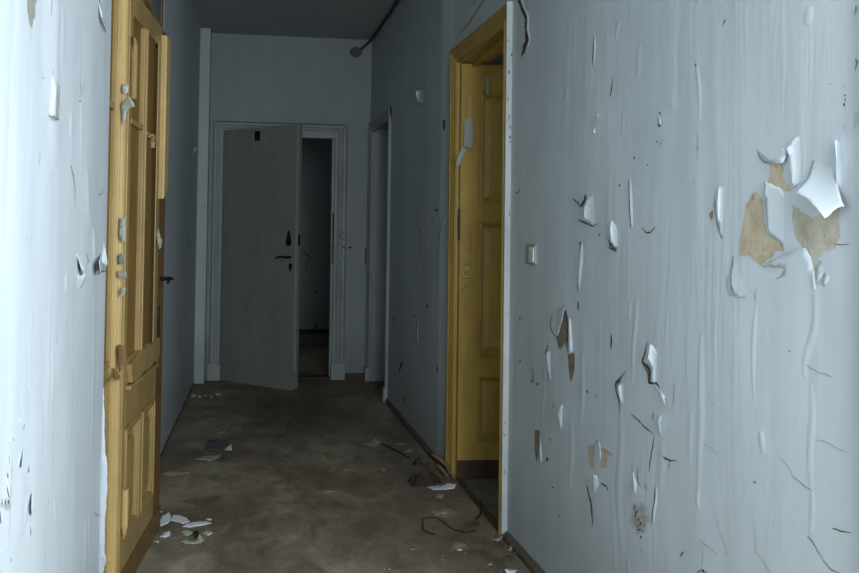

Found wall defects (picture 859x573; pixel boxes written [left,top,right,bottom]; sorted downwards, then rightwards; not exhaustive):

crack [518,0,530,57]
peeling [48,69,56,117]
peeling [456,116,474,166]
peeling [573,193,618,252]
peeling [709,185,724,238]
peeling [726,136,847,298]
peeling [76,242,107,288]
peeling [530,305,575,385]
peeling [615,372,625,411]
peeling [642,344,665,403]
peeling [534,430,551,463]